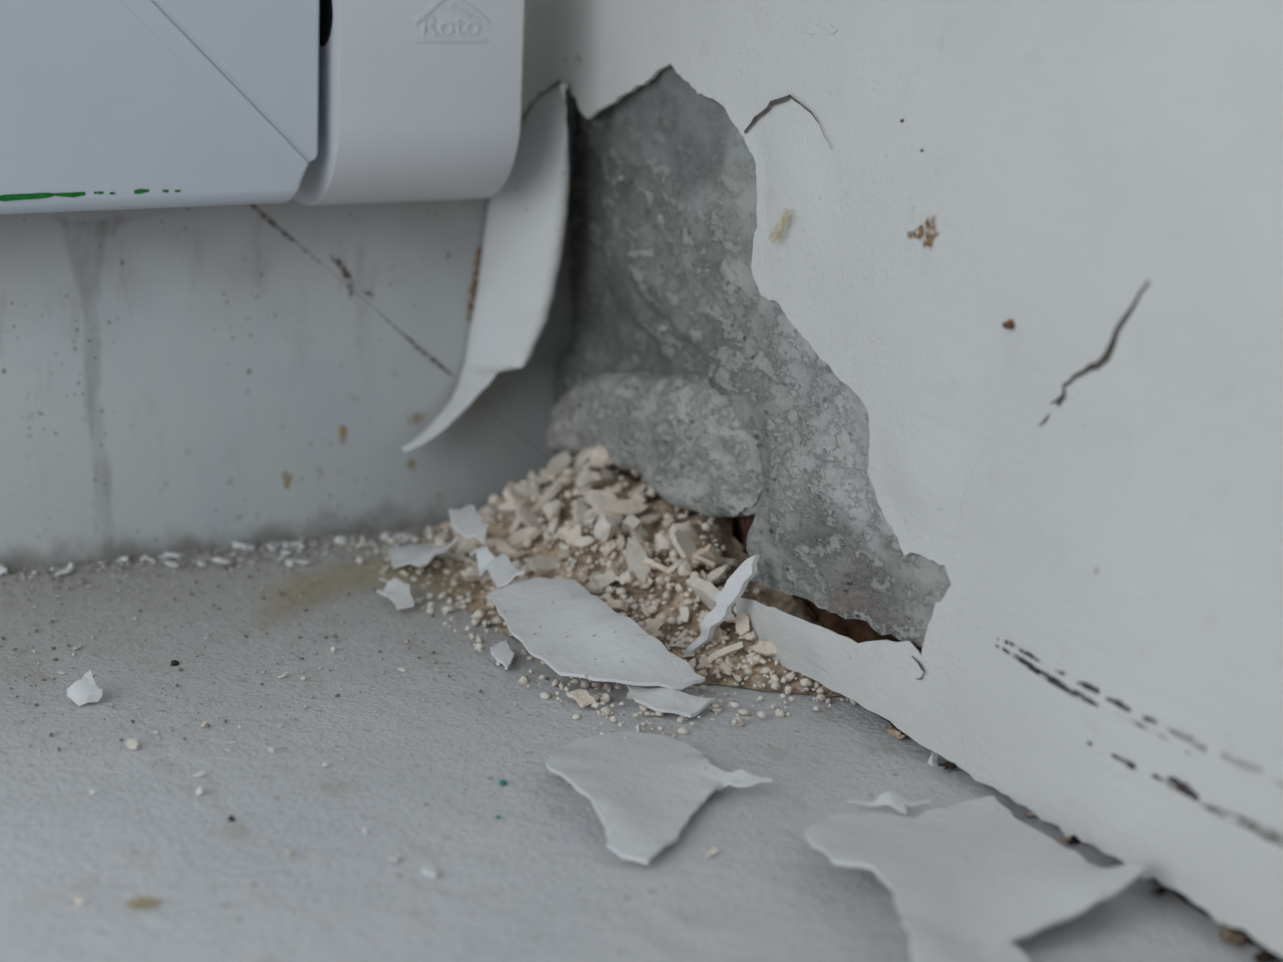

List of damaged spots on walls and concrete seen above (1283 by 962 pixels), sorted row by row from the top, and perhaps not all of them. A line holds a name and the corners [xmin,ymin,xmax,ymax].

crack [744,94,832,150]
corrosion [907,218,937,248]
crack [1039,280,1150,426]
flaking render [401,66,966,768]
crack [877,714,908,739]
crack [938,761,958,770]
crack [1061,835,1082,844]
crack [1150,878,1283,962]